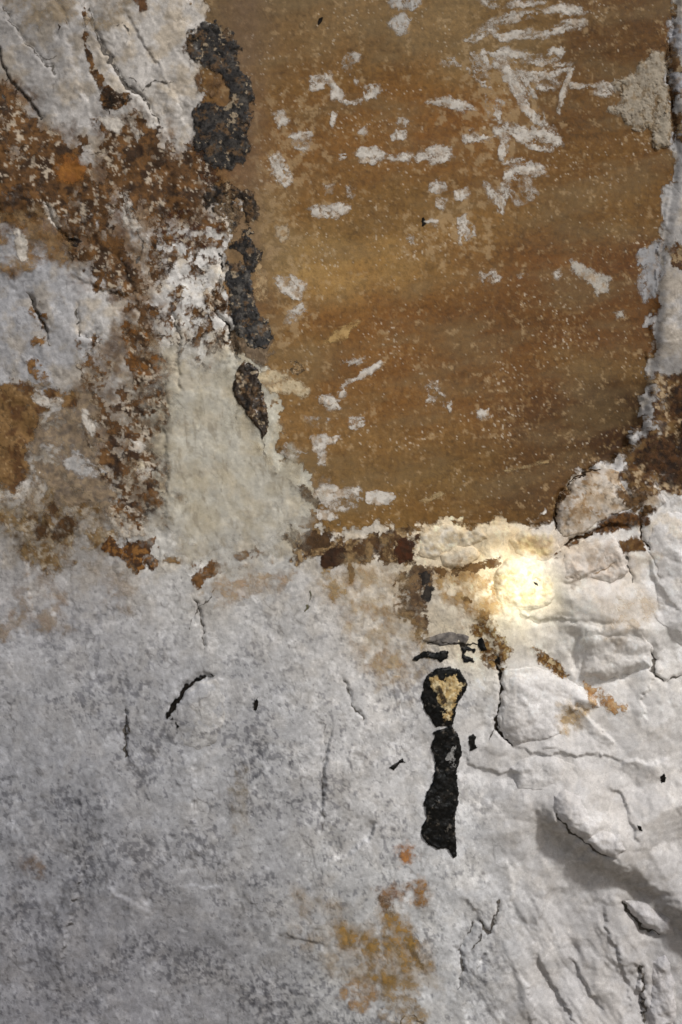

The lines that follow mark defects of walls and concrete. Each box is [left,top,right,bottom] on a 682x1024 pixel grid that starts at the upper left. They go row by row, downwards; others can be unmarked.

spalling [309,72,381,127]
peeling [427,0,682,214]
spalling [339,118,452,165]
spalling [553,259,611,296]
rust [0,0,682,671]
spalling [108,344,396,571]
rust [532,647,570,679]
crack [650,652,681,681]
crack [166,674,214,733]
rust [560,681,628,733]
crack [622,901,660,935]
crack [638,965,647,1023]